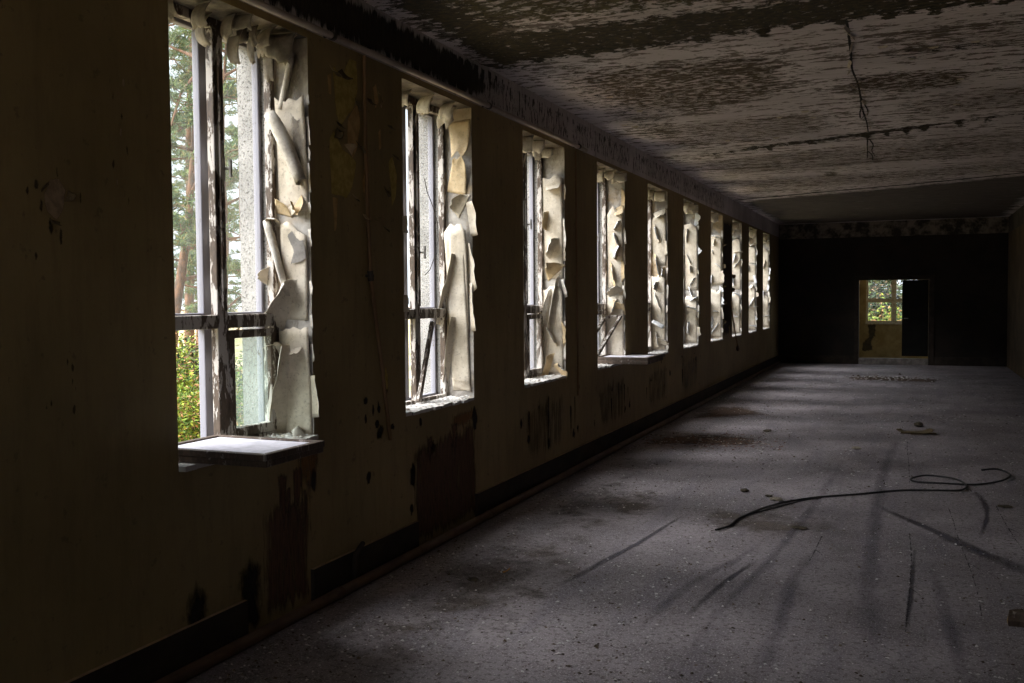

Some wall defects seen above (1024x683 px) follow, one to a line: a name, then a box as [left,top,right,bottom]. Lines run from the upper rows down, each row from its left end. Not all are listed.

peeling [485,77,569,160]
peeling [541,51,839,148]
crack [843,20,874,160]
peeling [841,14,1024,120]
peeling [168,0,319,438]
peeling [402,89,478,392]
peeling [539,174,568,380]
peeling [597,166,627,355]
peeling [648,188,669,350]
peeling [684,202,771,343]